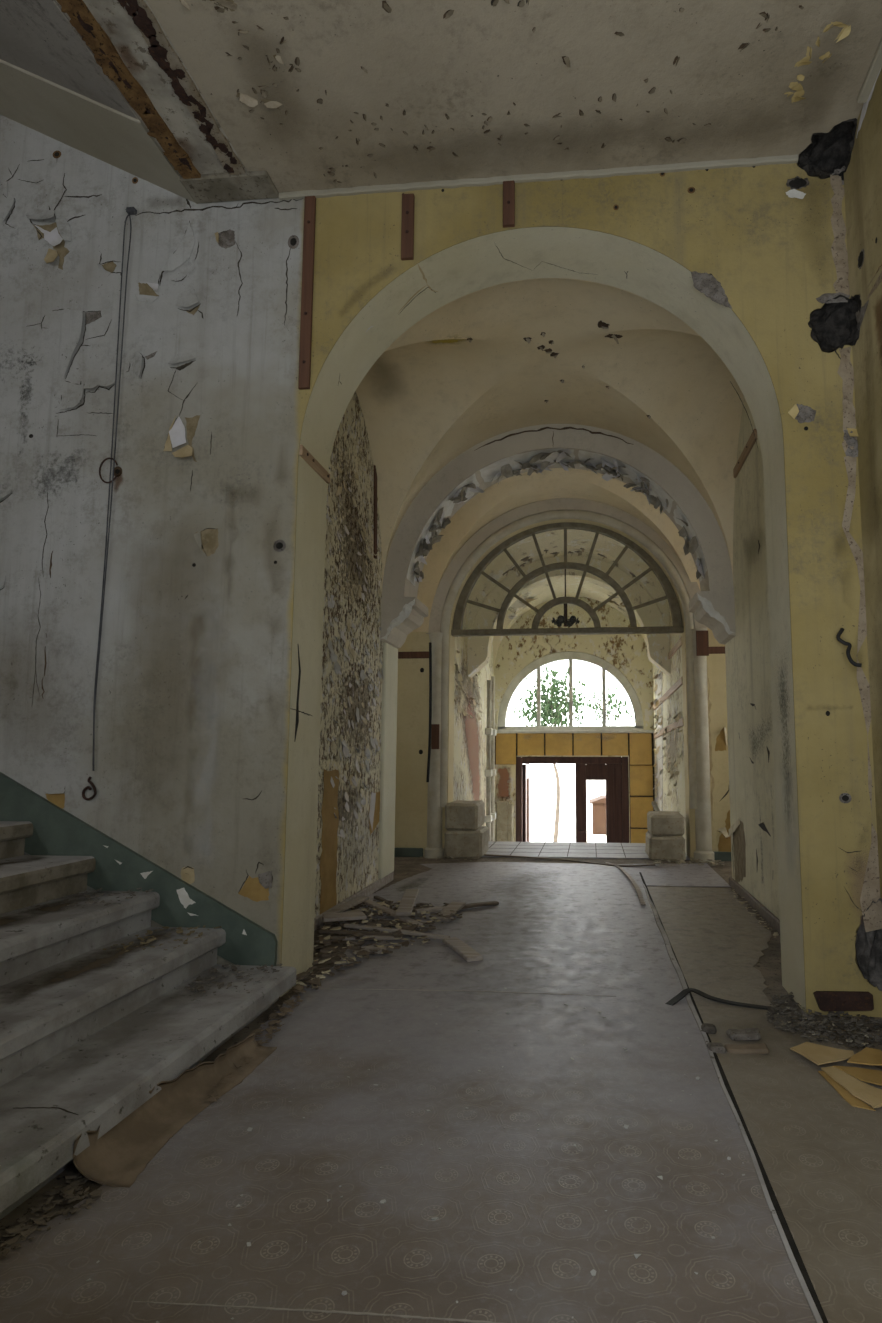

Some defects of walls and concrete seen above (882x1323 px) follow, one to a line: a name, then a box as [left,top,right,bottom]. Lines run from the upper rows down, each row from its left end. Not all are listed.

peeling [26,173,84,270]
flaking render [215,229,235,249]
peeling [97,256,121,276]
peeling [135,277,160,303]
peeling [49,308,102,379]
peeling [127,351,196,377]
peeling [163,390,200,492]